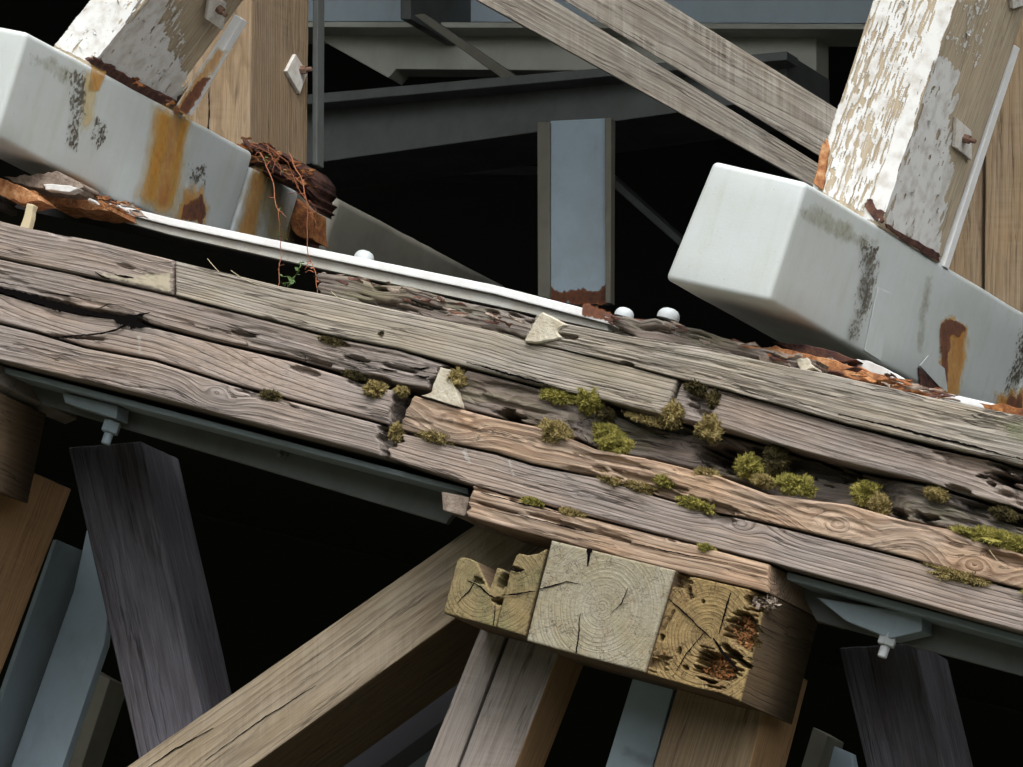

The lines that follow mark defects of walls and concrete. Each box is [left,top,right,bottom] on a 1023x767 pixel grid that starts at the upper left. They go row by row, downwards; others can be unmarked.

peeling [55,0,188,101]
corrosion [85,50,223,224]
peeling [813,0,991,253]
corrosion [864,199,941,261]
corrosion [550,284,612,321]
corrosion [764,318,967,397]
corrosion [980,389,1023,416]